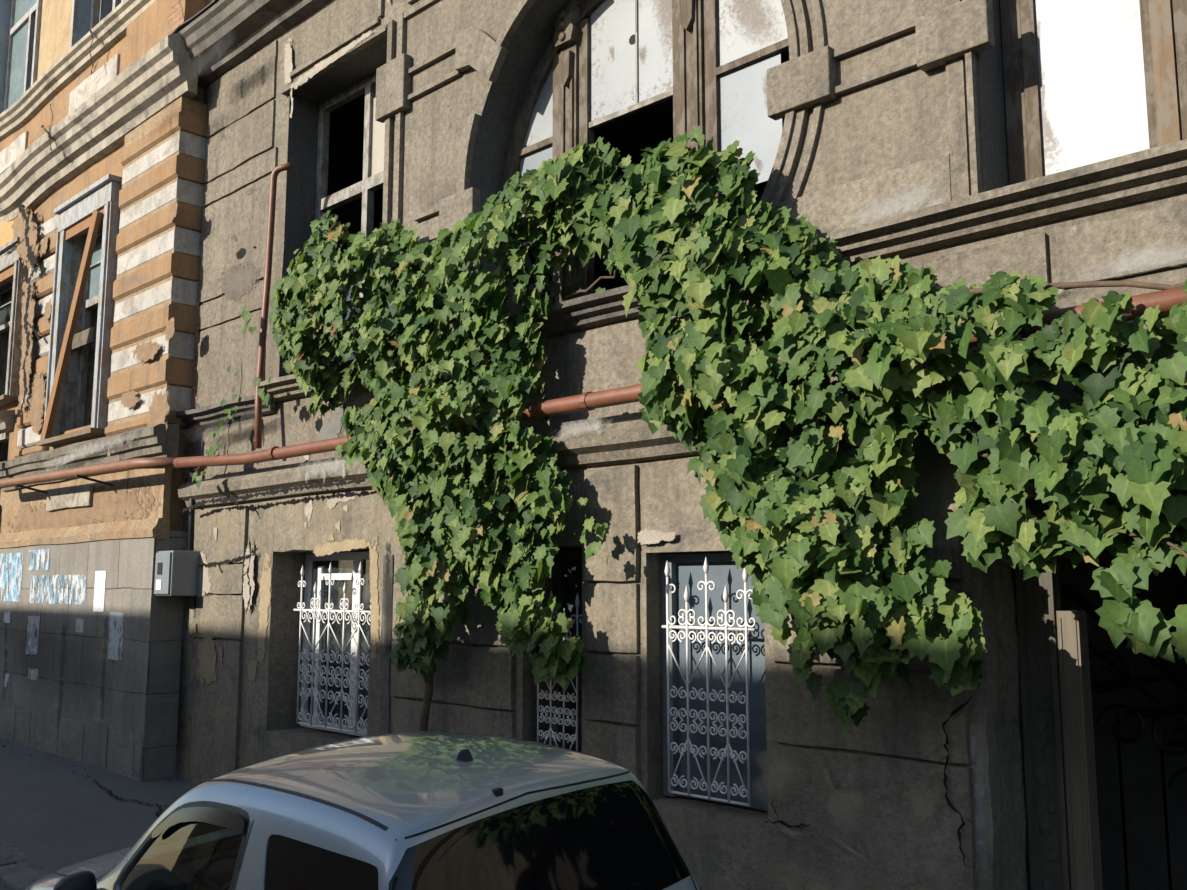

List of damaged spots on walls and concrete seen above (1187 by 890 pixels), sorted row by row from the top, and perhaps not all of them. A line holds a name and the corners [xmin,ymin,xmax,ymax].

peeling [284,28,378,118]
spalling [169,201,178,223]
crack [6,202,40,411]
peeling [132,318,175,362]
spalling [191,279,200,410]
spalling [120,386,170,431]
spalling [182,429,193,482]
crack [183,478,366,513]
crack [199,537,256,614]
peeling [304,490,382,667]
peeling [192,623,222,689]
crack [938,696,973,866]